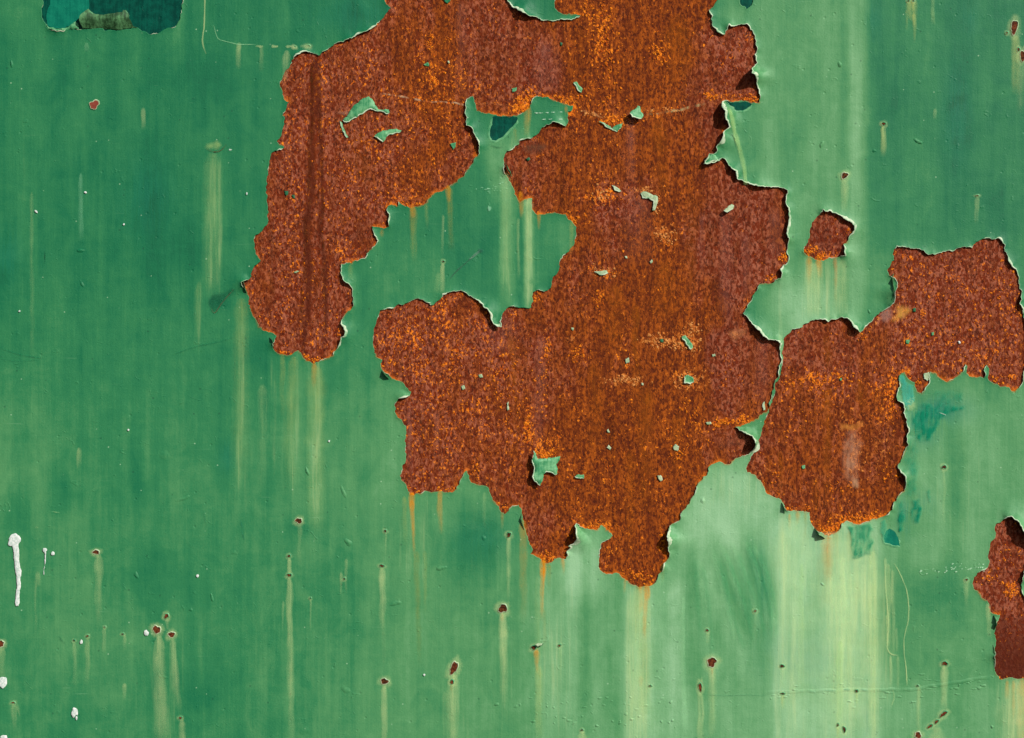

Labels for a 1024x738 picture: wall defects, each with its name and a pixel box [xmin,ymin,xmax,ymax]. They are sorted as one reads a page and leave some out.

peeling [42,0,184,34]
peeling [726,101,752,113]
peeling [488,116,518,143]
rust [241,0,1024,587]
peeling [902,377,963,440]
peeling [849,501,922,556]
rust [152,613,176,638]
rust [449,661,459,685]